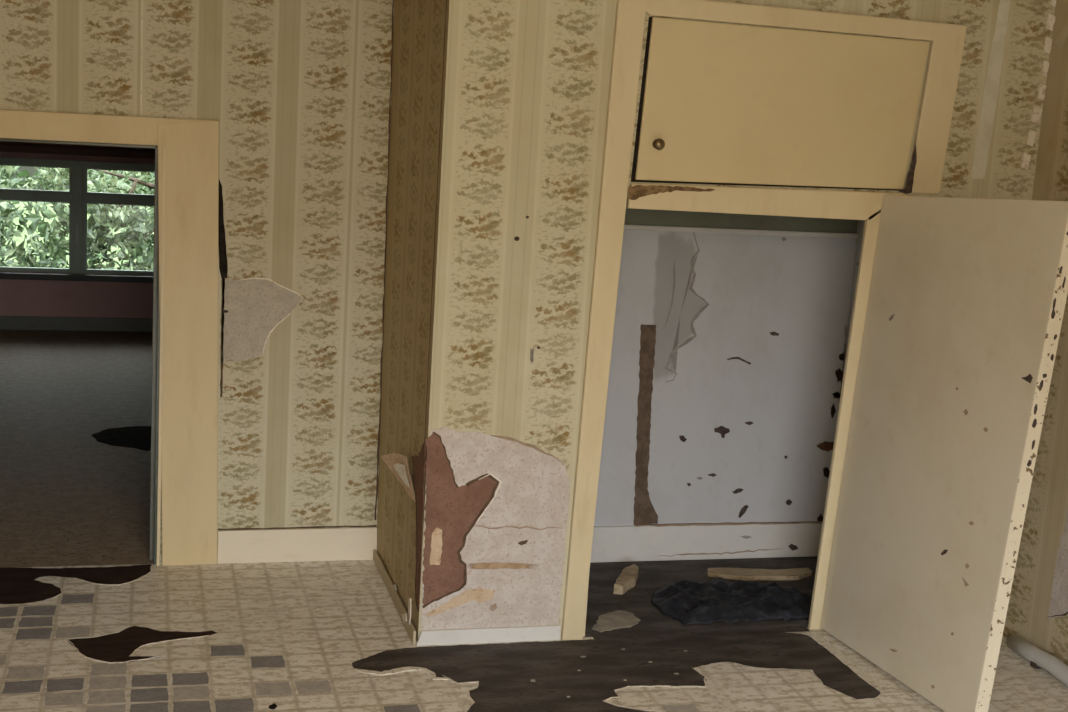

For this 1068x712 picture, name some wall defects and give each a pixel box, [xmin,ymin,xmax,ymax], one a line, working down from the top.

flaking render [381,427,570,630]